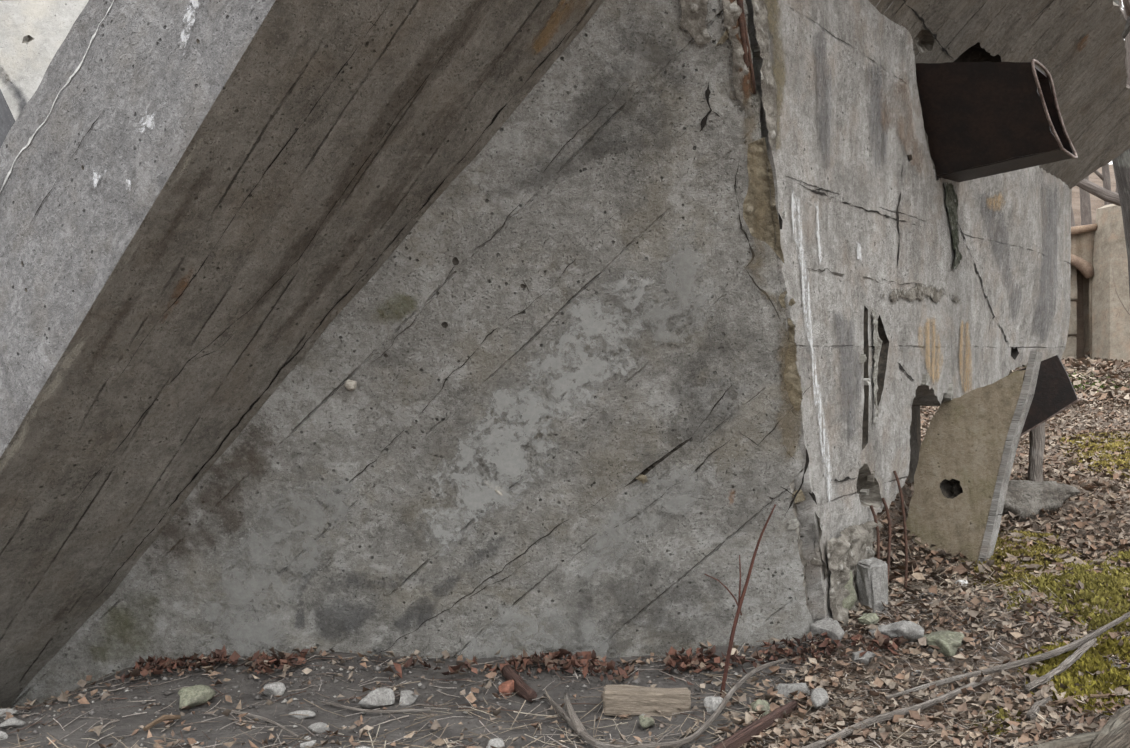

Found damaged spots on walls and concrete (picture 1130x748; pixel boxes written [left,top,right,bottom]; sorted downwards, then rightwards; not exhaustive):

crack [679,82,732,137]
spalling [913,29,934,53]
spalling [954,42,1001,63]
crack [785,166,924,285]
crack [958,224,1009,347]
spalling [862,306,889,450]
crack [577,383,857,554]
crack [373,492,611,656]
spalling [787,464,908,626]